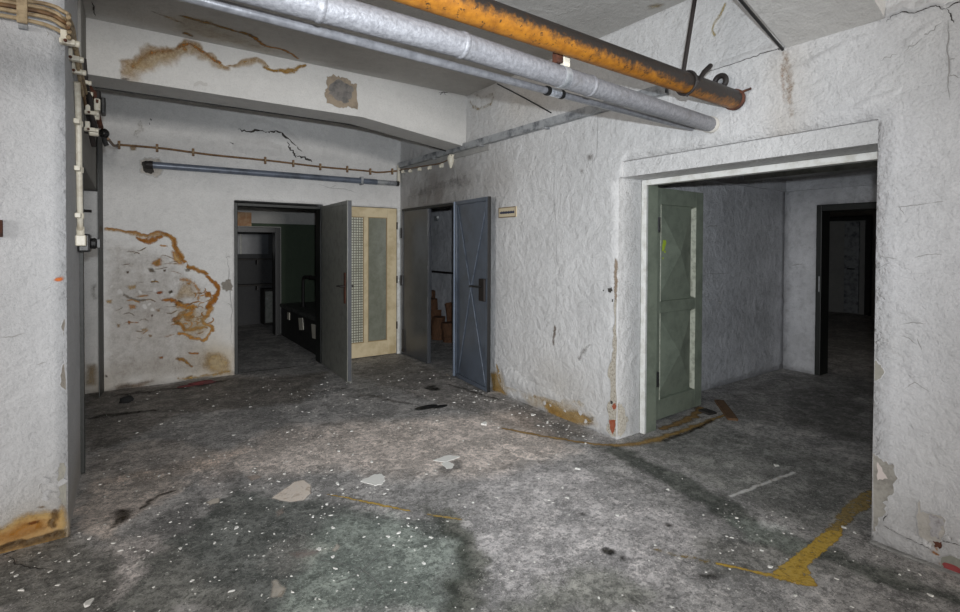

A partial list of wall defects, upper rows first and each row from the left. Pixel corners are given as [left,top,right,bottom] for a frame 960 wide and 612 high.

peeling [324,74,358,110]
crack [232,123,312,162]
spalling [578,287,629,438]
water stain [544,402,590,424]
spalling [872,453,900,534]
spalling [915,499,960,573]